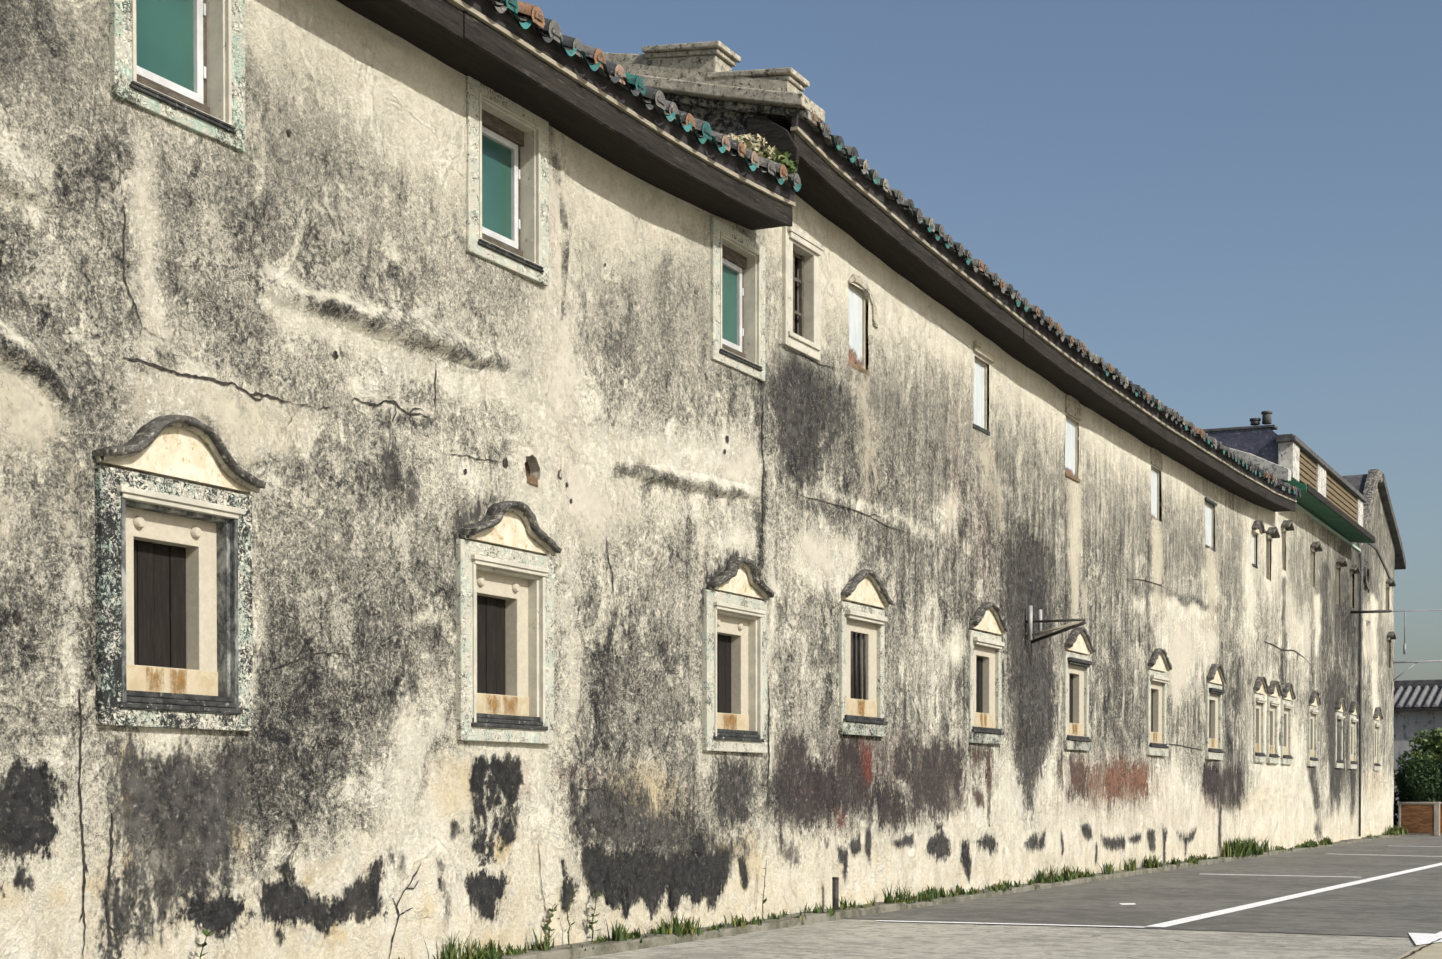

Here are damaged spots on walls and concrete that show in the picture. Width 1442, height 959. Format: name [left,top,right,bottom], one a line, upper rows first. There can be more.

crack [118,146,438,423]
water stain [87,731,269,959]
water stain [560,752,757,875]
mould [772,719,967,873]
water stain [1000,524,1060,817]
corrosion [1085,753,1150,810]